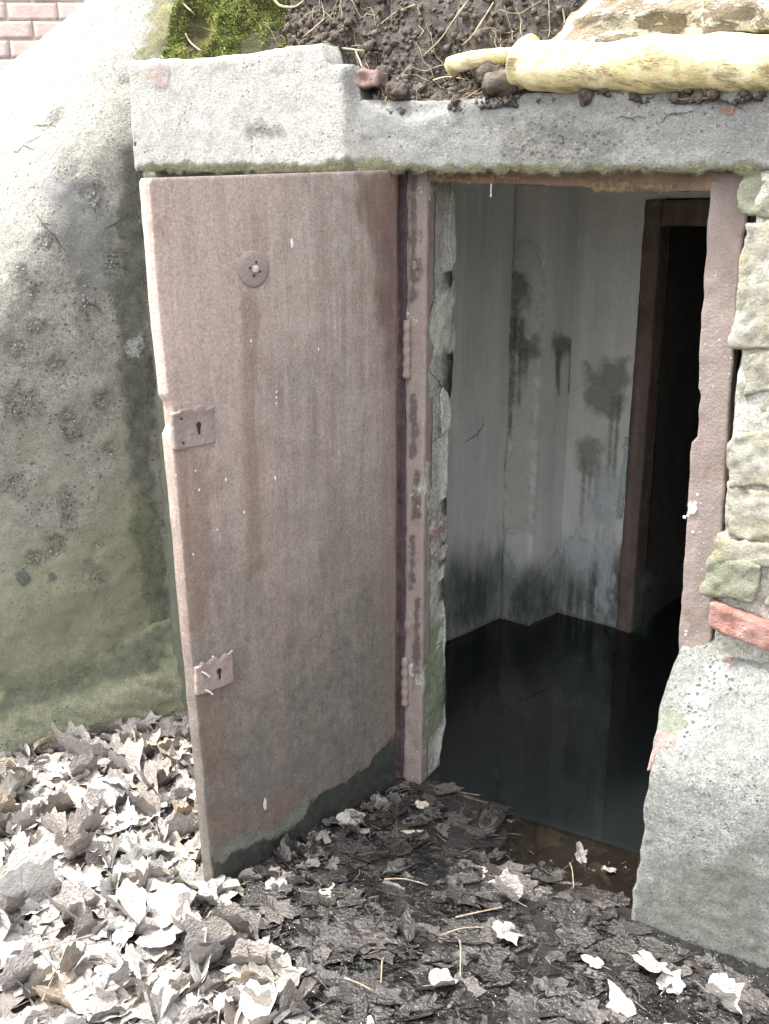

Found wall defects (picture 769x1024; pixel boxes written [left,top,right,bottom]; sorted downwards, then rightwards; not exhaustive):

rust [430,173,519,184]
rust [584,179,676,192]
damp [0,151,172,712]
damp [509,273,539,428]
damp [553,336,571,394]
damp [580,361,627,525]
damp [444,532,620,641]
damp [211,739,397,879]